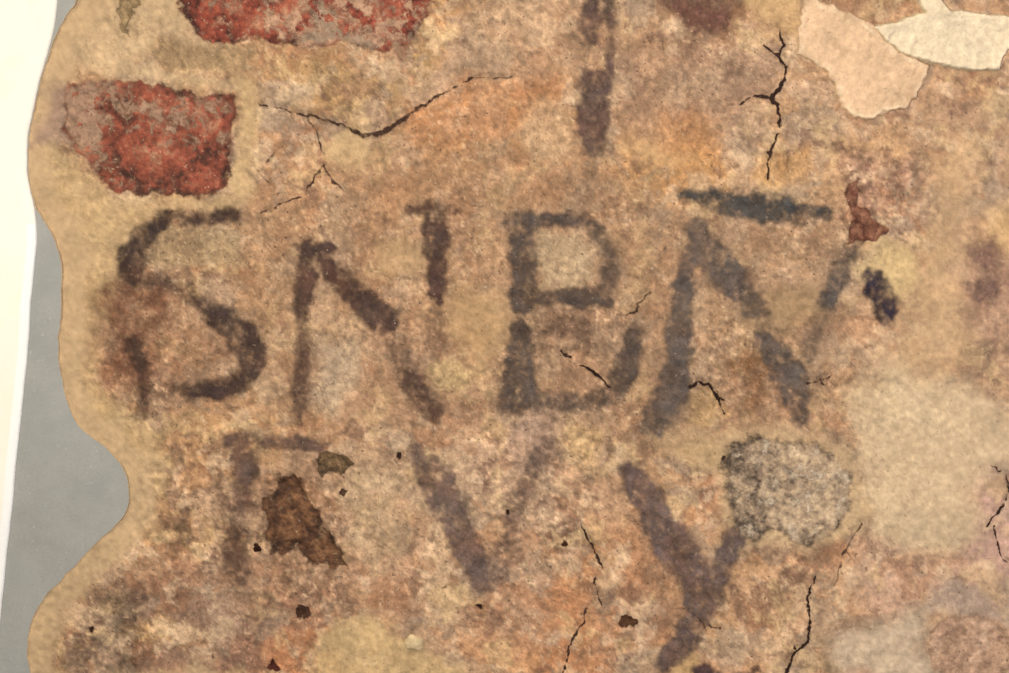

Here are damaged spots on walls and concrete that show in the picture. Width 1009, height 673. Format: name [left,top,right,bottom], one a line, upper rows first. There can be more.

crack [259,76,512,213]
crack [740,29,788,180]
flaking render [796,0,1009,121]
spalling [261,475,347,569]
crack [986,466,1009,562]
crack [562,525,603,673]
crack [785,523,862,673]